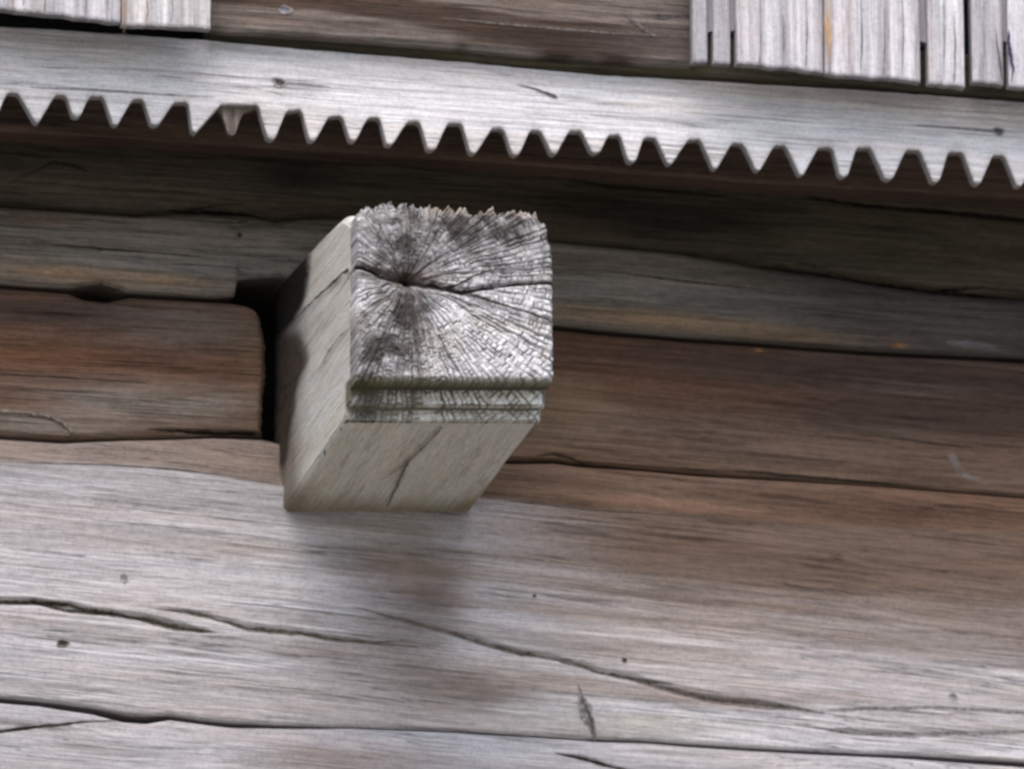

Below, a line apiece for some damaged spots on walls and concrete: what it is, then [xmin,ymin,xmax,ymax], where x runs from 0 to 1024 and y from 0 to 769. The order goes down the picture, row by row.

crack [293,266,554,324]
crack [383,427,443,507]
crack [0,598,1024,737]